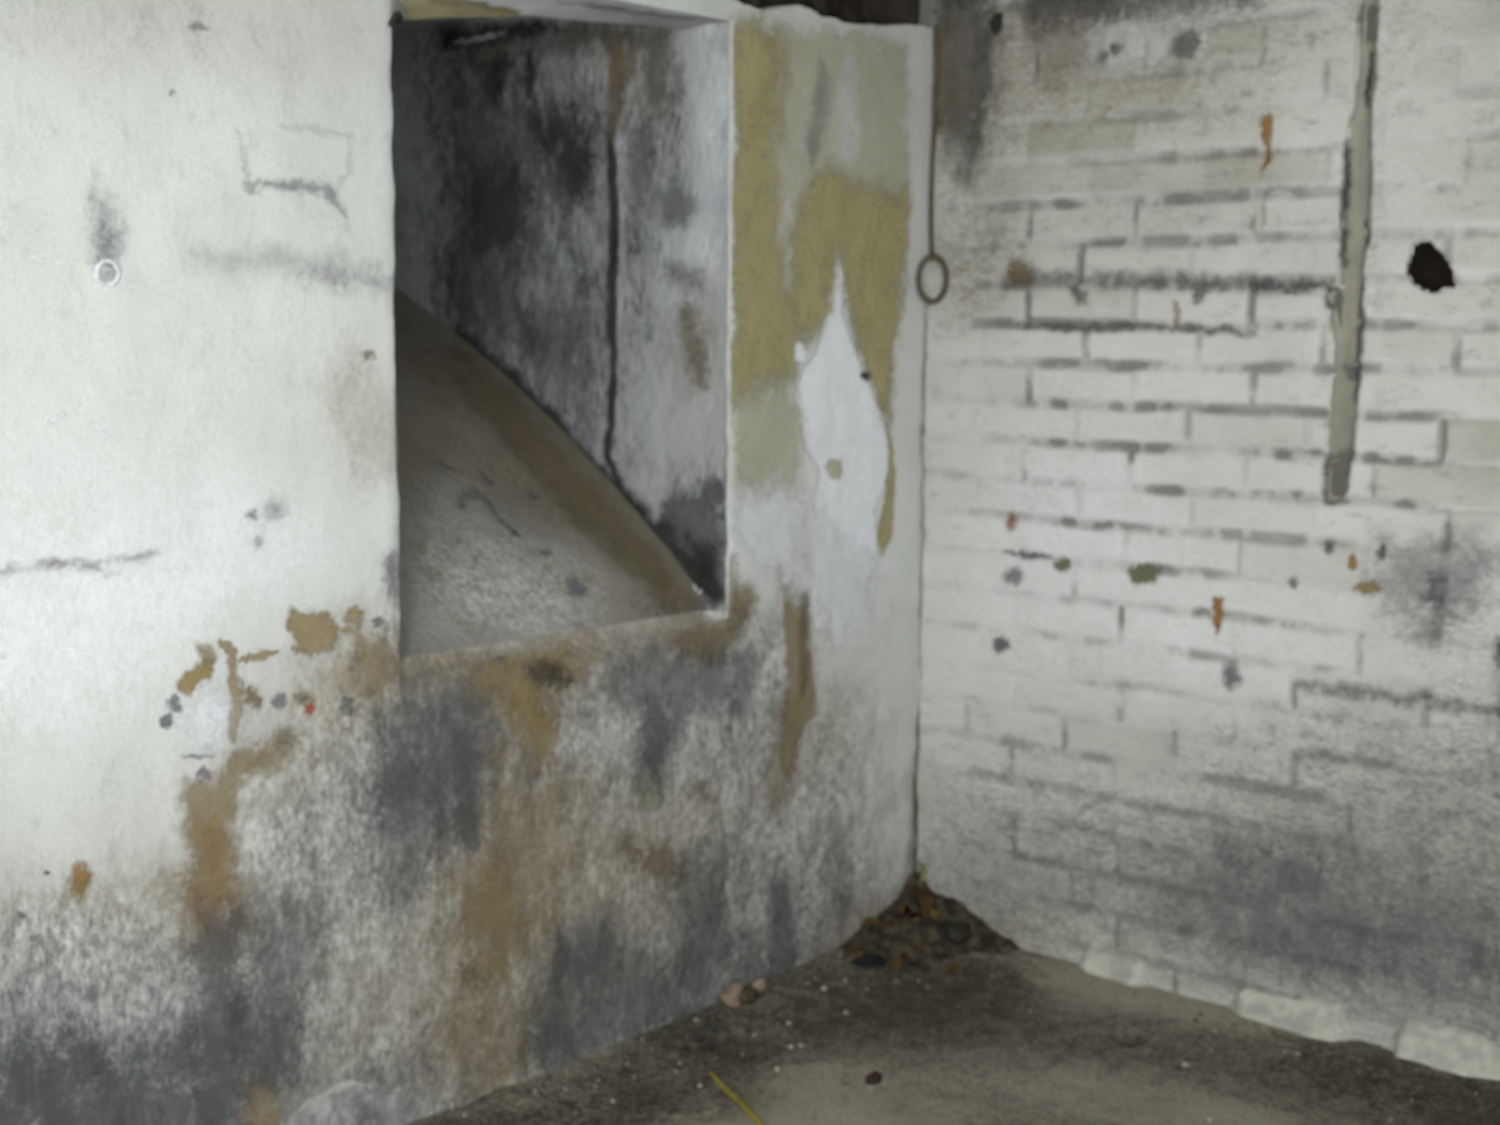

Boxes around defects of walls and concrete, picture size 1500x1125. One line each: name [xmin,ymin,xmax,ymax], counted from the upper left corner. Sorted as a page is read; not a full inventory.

water stain [399,0,518,21]
water stain [931,0,999,180]
rust [1261,113,1273,169]
water stain [437,24,755,665]
crack [591,4,686,481]
peeling [729,0,920,648]
spalling [1406,239,1457,295]
peeling [160,605,395,782]
water stain [779,548,815,777]
rust [1212,597,1224,634]
water stain [180,730,295,907]
water stain [0,921,246,1125]